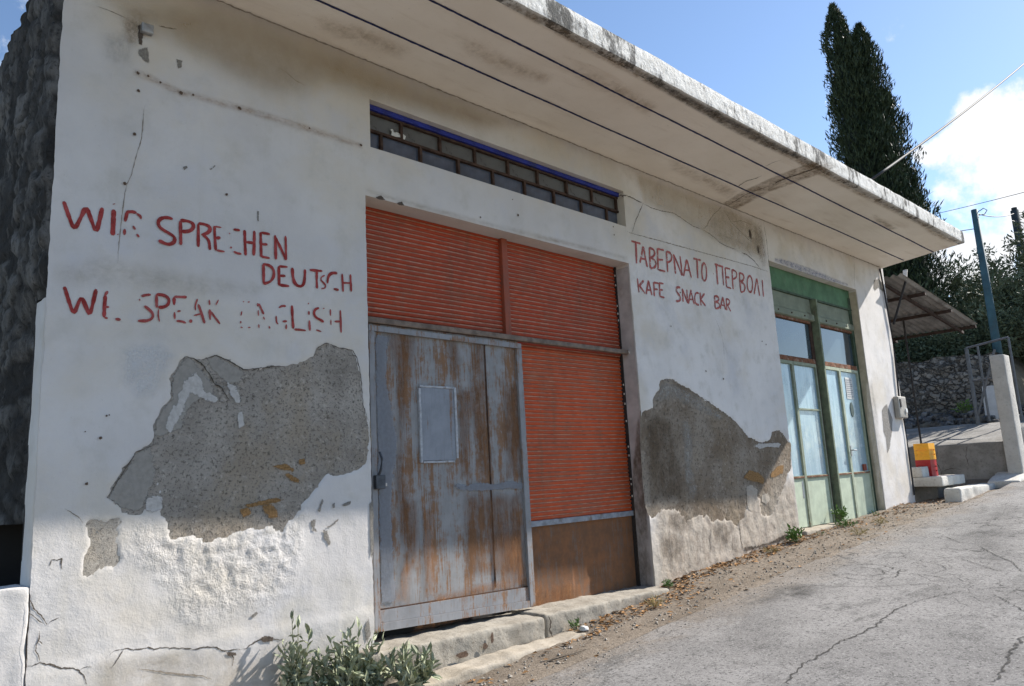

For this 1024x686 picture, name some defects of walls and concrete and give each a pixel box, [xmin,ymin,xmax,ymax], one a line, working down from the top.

crack [118,114,144,251]
flaking render [83,343,372,577]
flaking render [640,379,791,526]
crack [25,600,87,684]
crack [113,639,282,679]